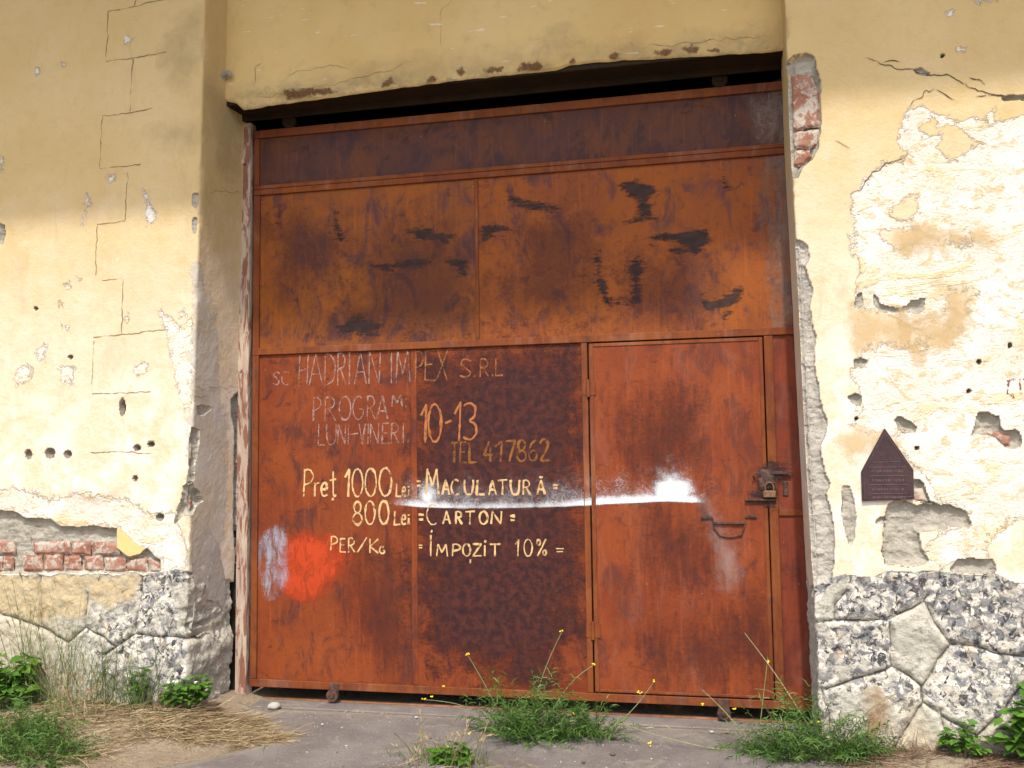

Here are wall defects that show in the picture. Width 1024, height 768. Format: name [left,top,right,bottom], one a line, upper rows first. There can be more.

rust [284,88,333,100]
flaking render [787,53,822,178]
crack [869,58,1020,105]
rust [508,196,560,213]
rust [618,179,656,223]
rust [651,229,710,256]
rust [593,250,644,307]
rust [699,288,744,320]
peeling [847,94,1024,576]
flaking render [795,238,857,587]
flaking render [0,259,238,637]
rust [408,344,592,689]